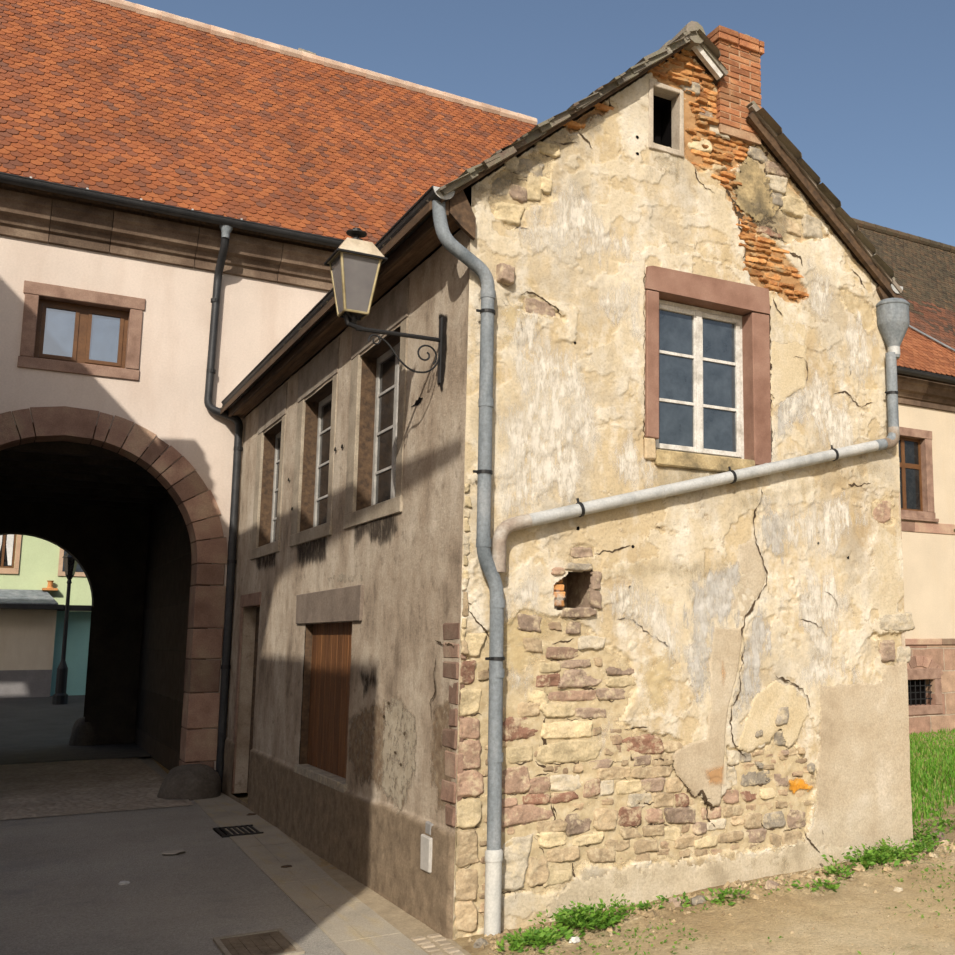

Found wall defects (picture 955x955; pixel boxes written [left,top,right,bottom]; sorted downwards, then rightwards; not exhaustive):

spalling [647,48,877,379]
peeling [499,296,596,514]
peeling [615,434,654,484]
crack [835,367,873,407]
spalling [430,484,489,939]
spalling [501,543,818,893]
crack [729,489,768,757]
crack [776,676,810,705]